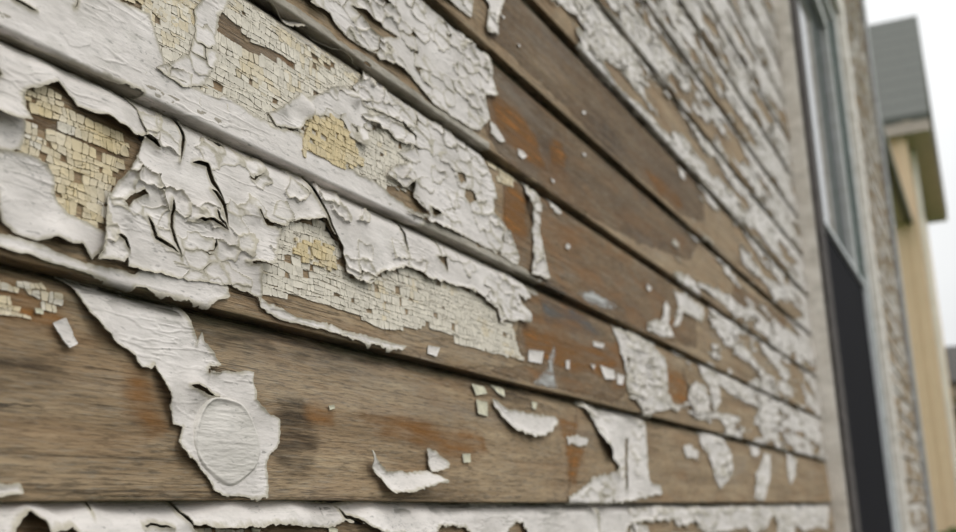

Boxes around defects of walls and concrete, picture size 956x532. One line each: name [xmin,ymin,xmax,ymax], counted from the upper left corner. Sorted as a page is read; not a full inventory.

crack [181,142,225,228]
peeling [489,0,827,485]
peeling [0,265,830,532]